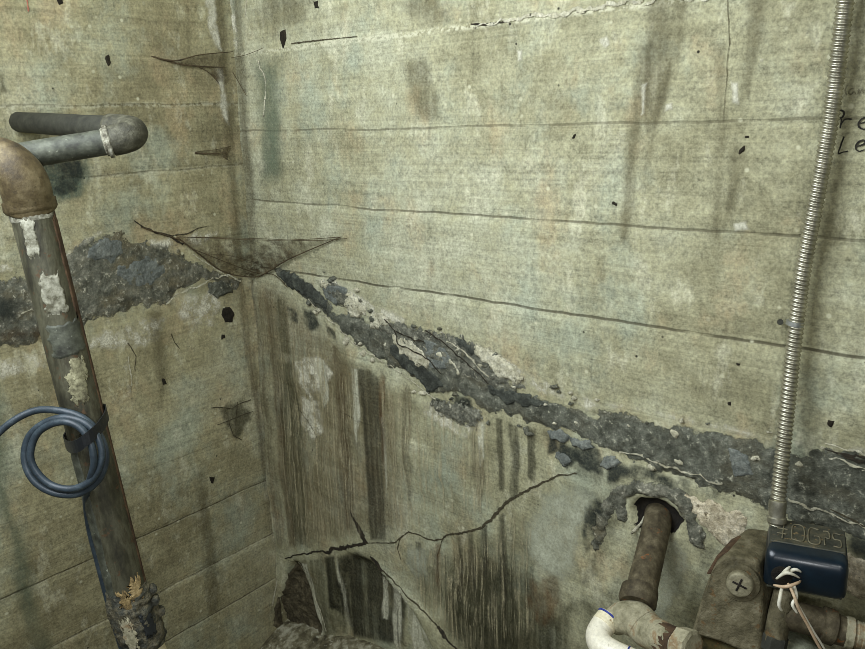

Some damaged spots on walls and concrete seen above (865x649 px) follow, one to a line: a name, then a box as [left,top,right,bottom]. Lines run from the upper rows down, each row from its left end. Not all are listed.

spalling [0,230,242,348]
leakage [279,309,335,342]
peeling [64,355,90,407]
spalling [272,561,327,635]
leakage [281,354,419,541]
leakage [302,553,434,649]
crack [285,472,576,649]
leakage [497,422,533,497]
spalling [275,267,776,617]
leakage [582,501,602,537]
leakage [548,437,672,488]
spalling [785,443,865,540]